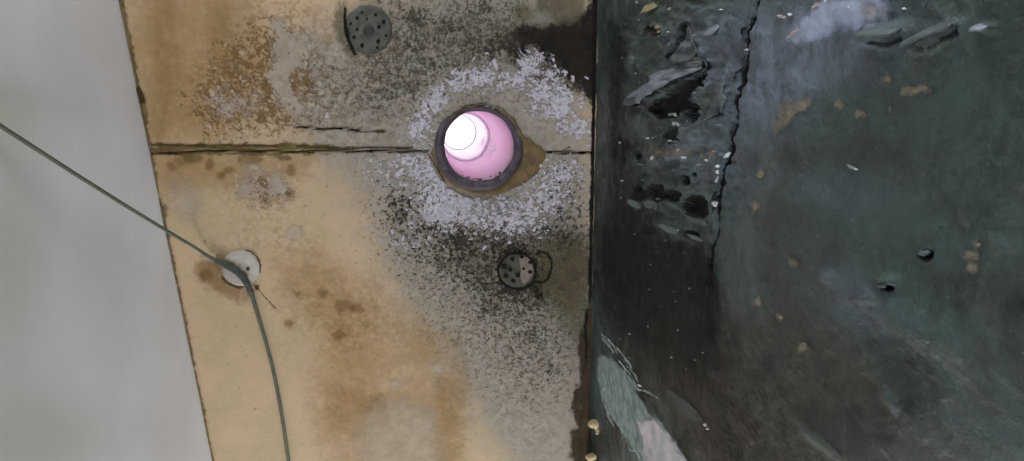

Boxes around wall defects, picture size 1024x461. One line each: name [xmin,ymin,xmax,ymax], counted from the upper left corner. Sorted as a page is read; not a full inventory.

crack [119,0,445,461]
leakage [330,0,709,461]
peeling [620,1,727,241]
crack [708,0,761,282]